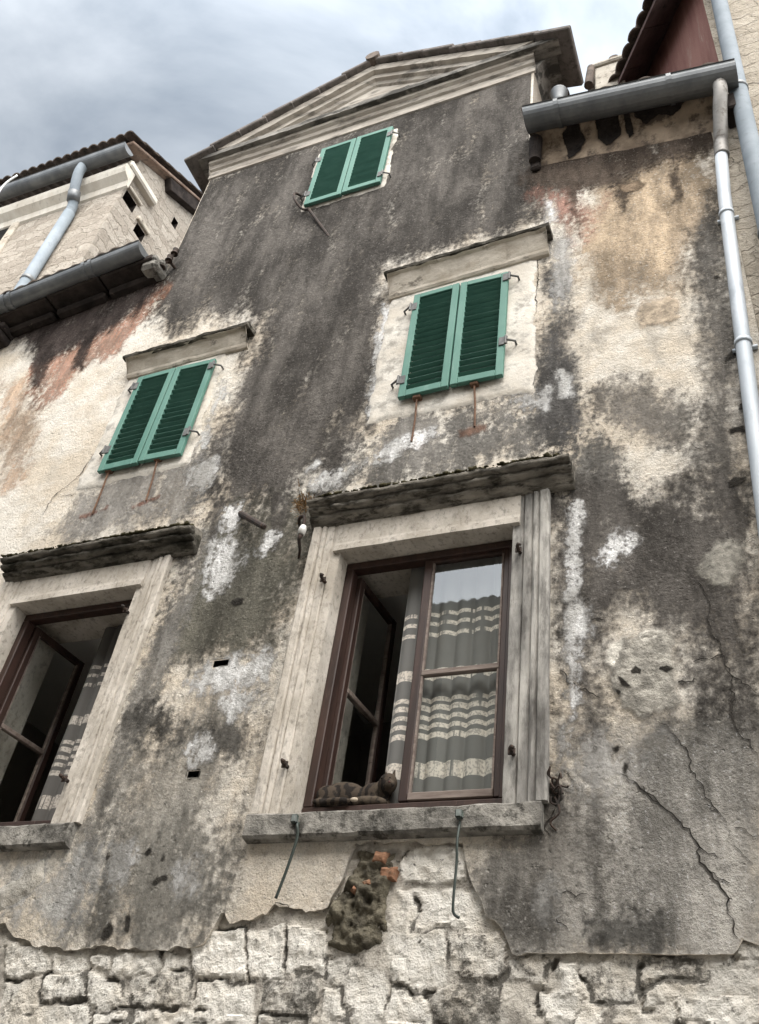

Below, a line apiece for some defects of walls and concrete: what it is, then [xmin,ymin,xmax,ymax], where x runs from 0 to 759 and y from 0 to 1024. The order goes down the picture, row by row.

peeling [562,102,684,159]
rust [0,282,172,491]
water stain [29,74,586,950]
water stain [474,153,759,955]
flaking render [606,628,681,718]
crack [678,582,758,755]
flaking render [100,915,131,940]
flaking render [325,851,400,954]
crack [617,708,756,938]